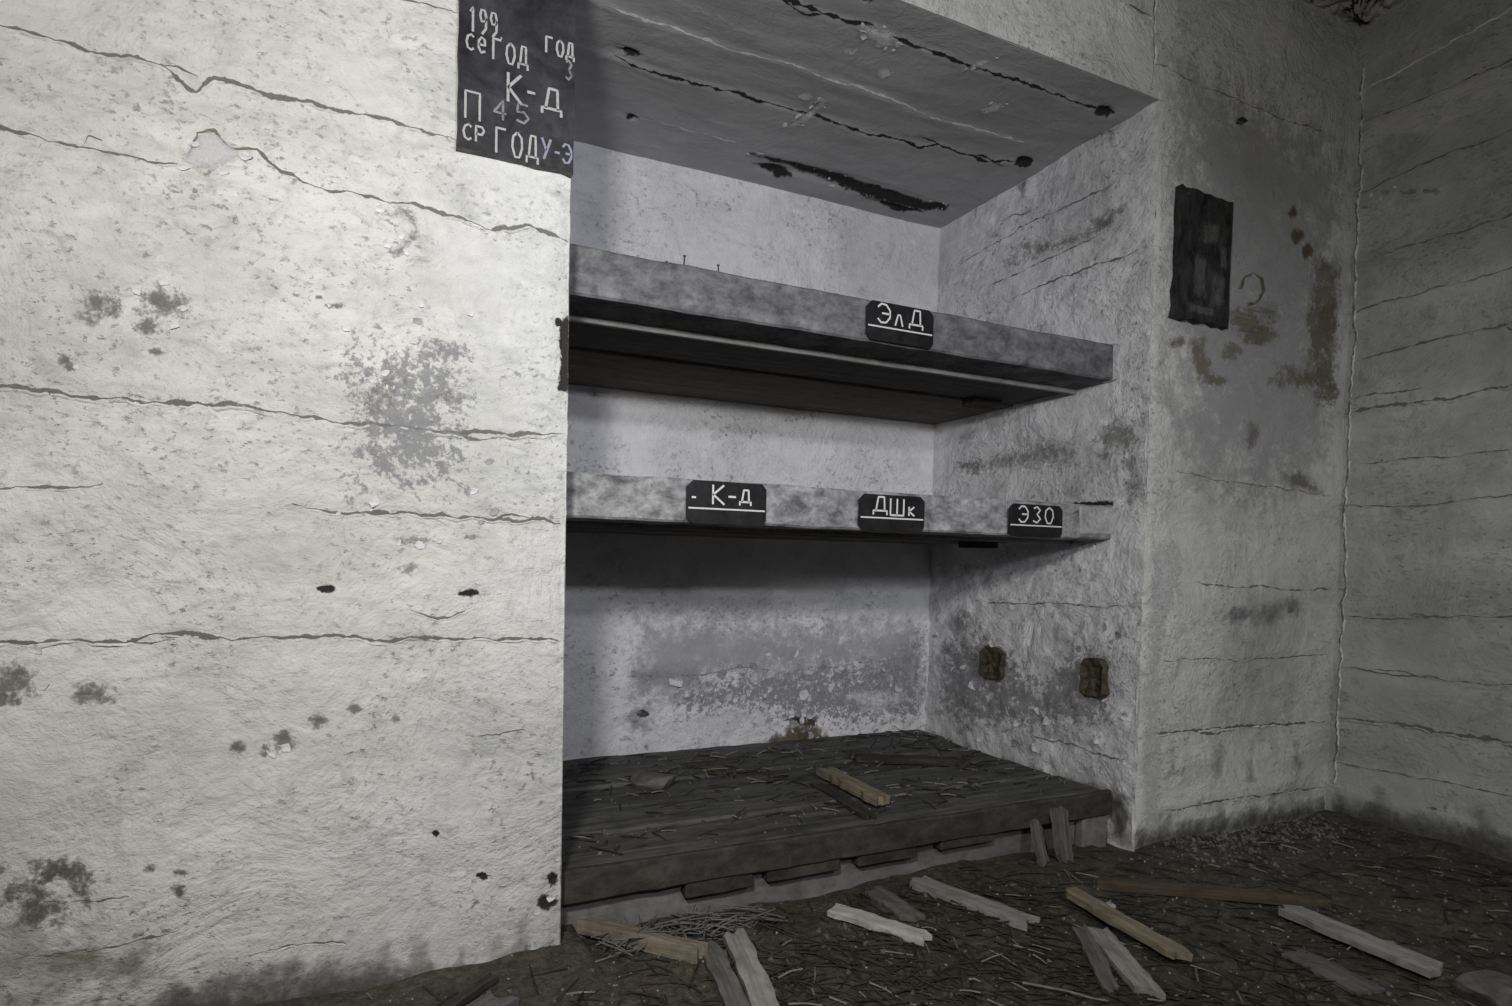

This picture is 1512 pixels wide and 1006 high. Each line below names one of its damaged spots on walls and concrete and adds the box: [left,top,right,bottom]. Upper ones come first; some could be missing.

crack [396,0,458,15]
crack [610,6,1025,166]
crack [783,0,1096,108]
crack [0,25,568,244]
crack [962,183,1139,303]
corrosion [1289,207,1313,258]
crack [0,383,562,441]
crack [1023,0,1512,813]
crack [0,608,558,648]
crack [973,600,1134,610]
water stain [0,858,90,925]